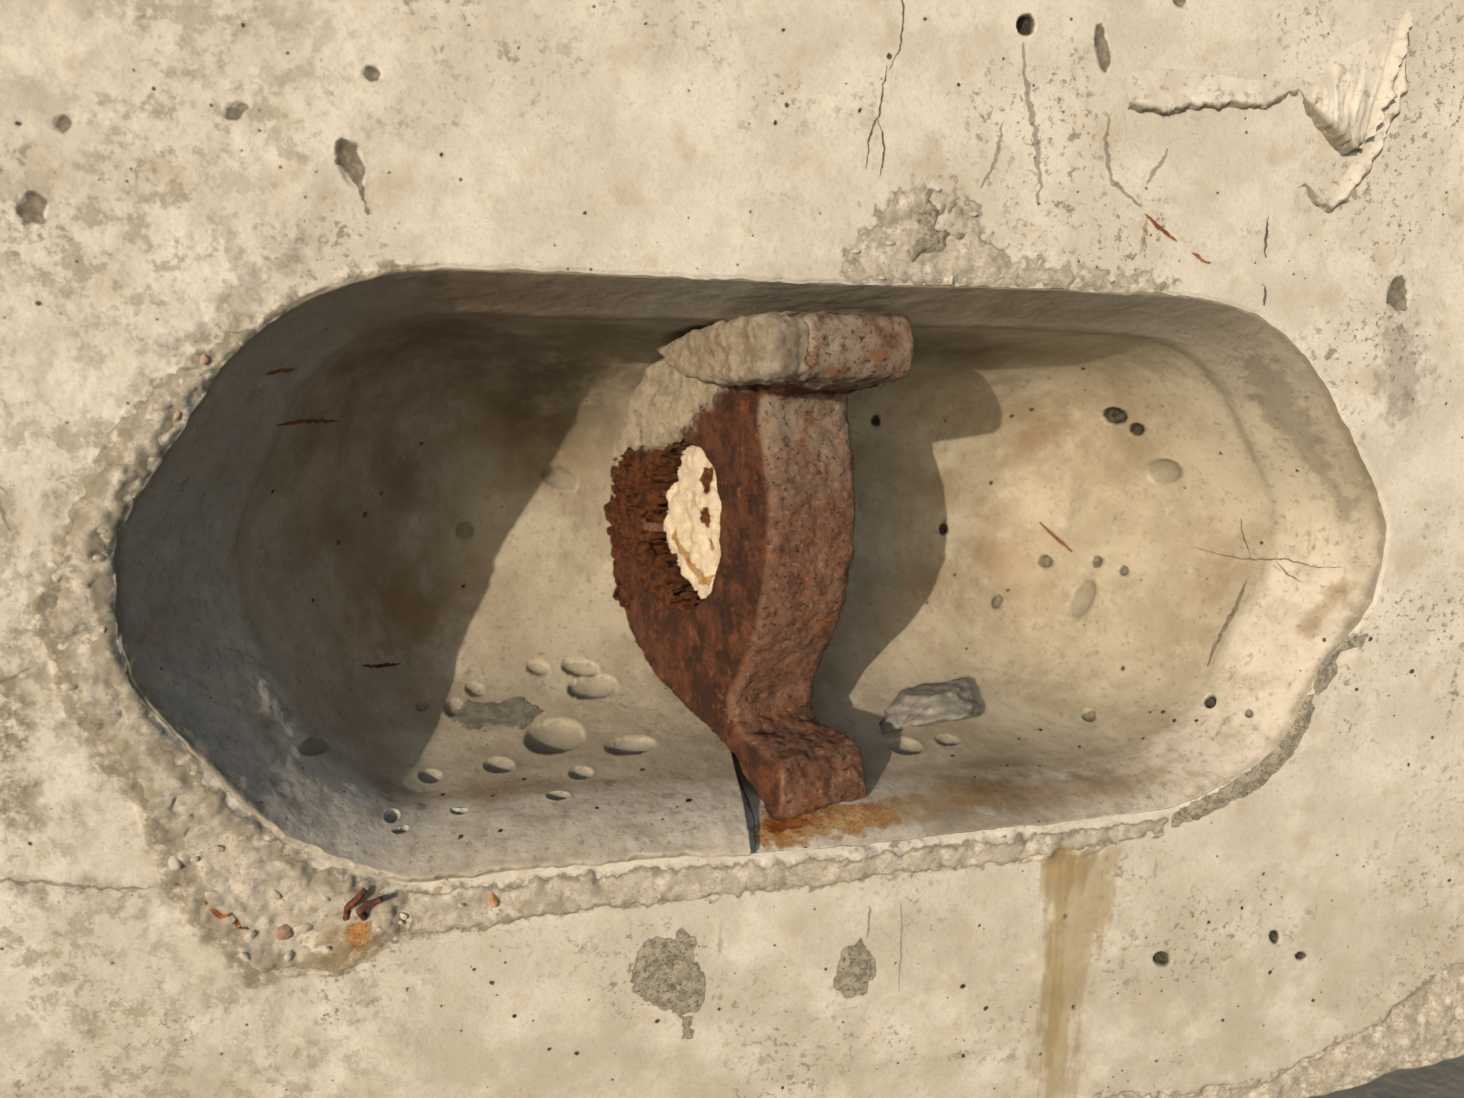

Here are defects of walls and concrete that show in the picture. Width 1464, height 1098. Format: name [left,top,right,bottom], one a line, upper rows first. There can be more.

crack [865,0,905,176]
spalling [842,176,1178,292]
corrosion [672,530,715,586]
corrosion [700,467,714,550]
spalling [46,305,1368,972]
crack [1193,518,1342,666]
corrosion [752,798,902,848]
spalling [834,939,876,998]
spalling [1094,963,1464,1098]